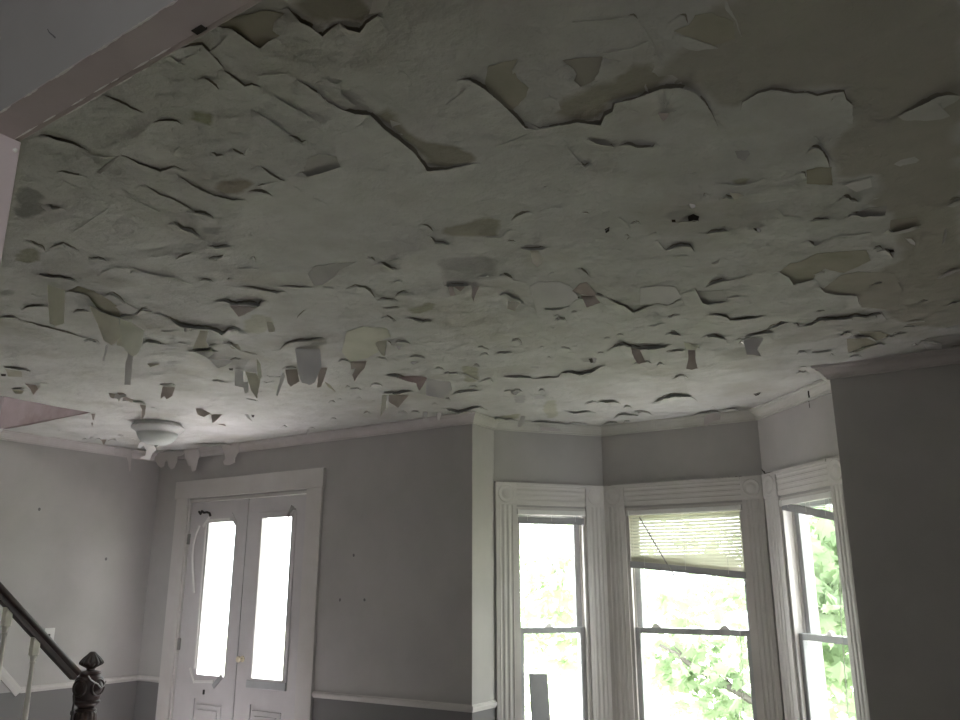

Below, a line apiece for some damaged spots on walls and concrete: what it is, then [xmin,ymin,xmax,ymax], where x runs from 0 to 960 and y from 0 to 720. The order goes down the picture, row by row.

peeling [13,47,171,190]
peeling [209,0,719,191]
peeling [740,87,853,124]
peeling [898,91,960,121]
peeling [10,180,68,222]
peeling [124,148,348,220]
peeling [502,137,960,381]
peeling [0,214,528,427]
peeling [81,414,239,471]
peeling [564,393,740,427]